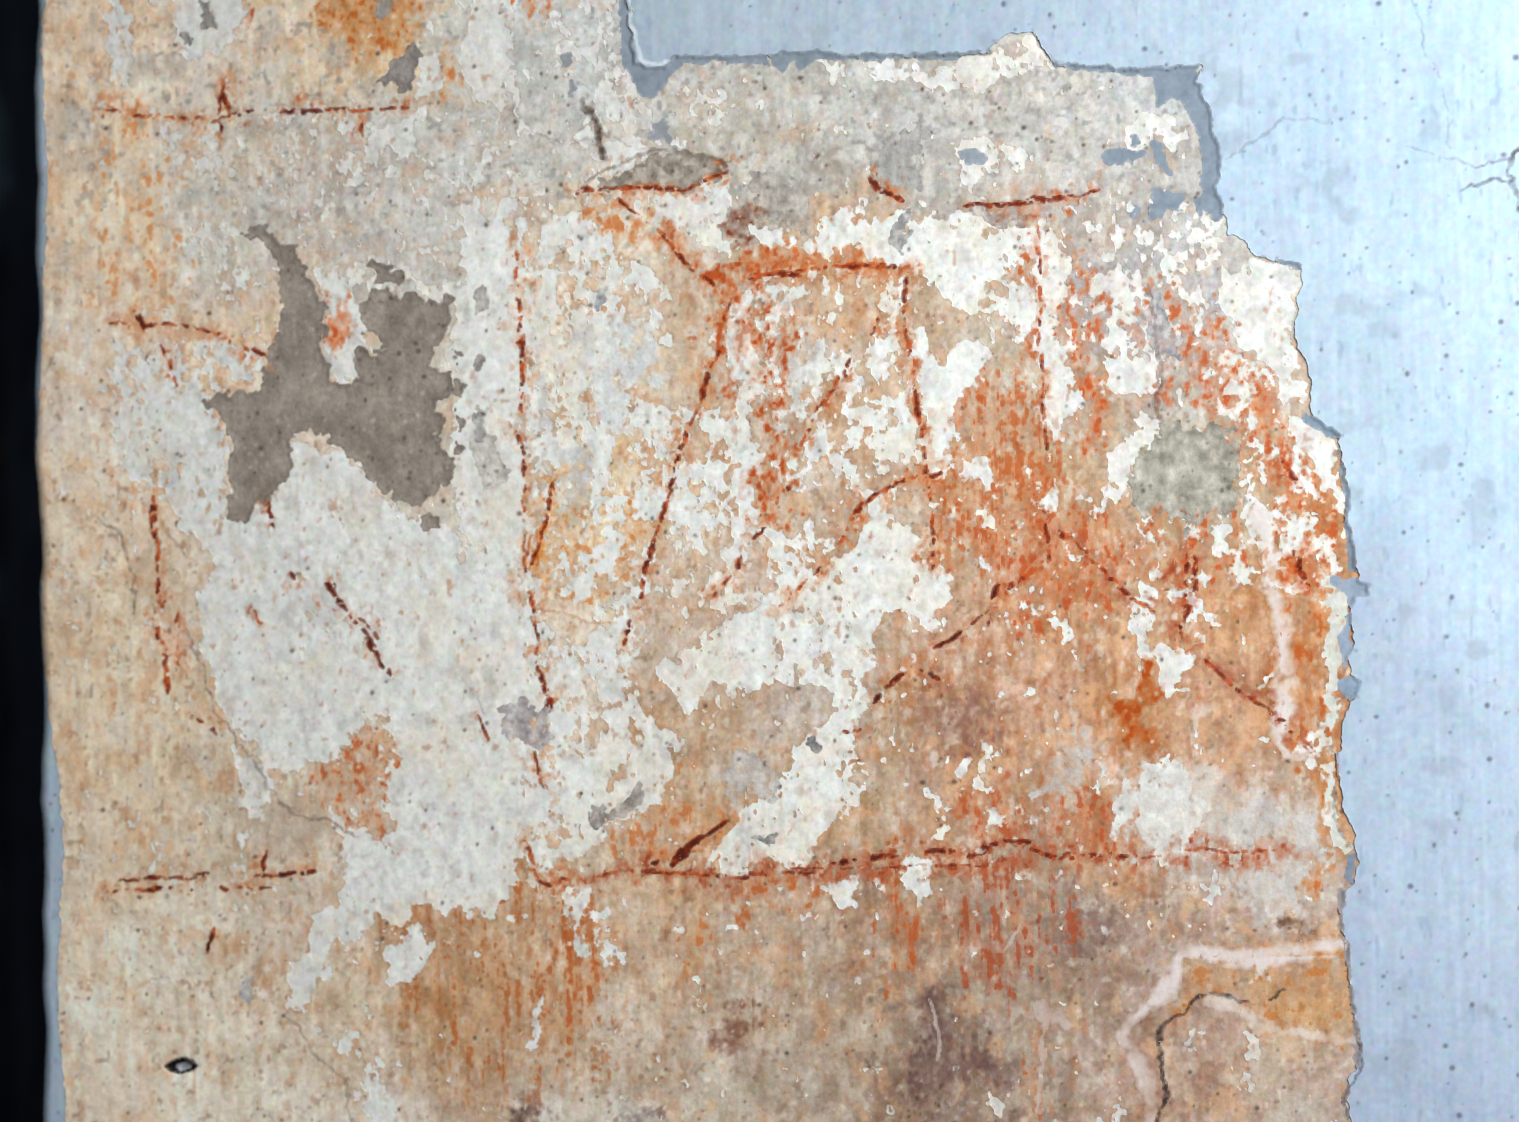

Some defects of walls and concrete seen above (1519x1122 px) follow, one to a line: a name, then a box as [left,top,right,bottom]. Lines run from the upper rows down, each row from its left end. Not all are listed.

crack [1403,0,1519,238]
spalling [728,270,765,313]
spalling [1203,367,1227,384]
spalling [1218,379,1254,424]
spalling [1244,409,1259,430]
spalling [957,452,1004,531]
spalling [630,539,649,558]
spalling [1269,510,1323,553]
rust [364,153,1354,1122]
spalling [984,800,1006,839]
crack [1154,987,1287,1122]
spalling [1128,977,1363,1122]